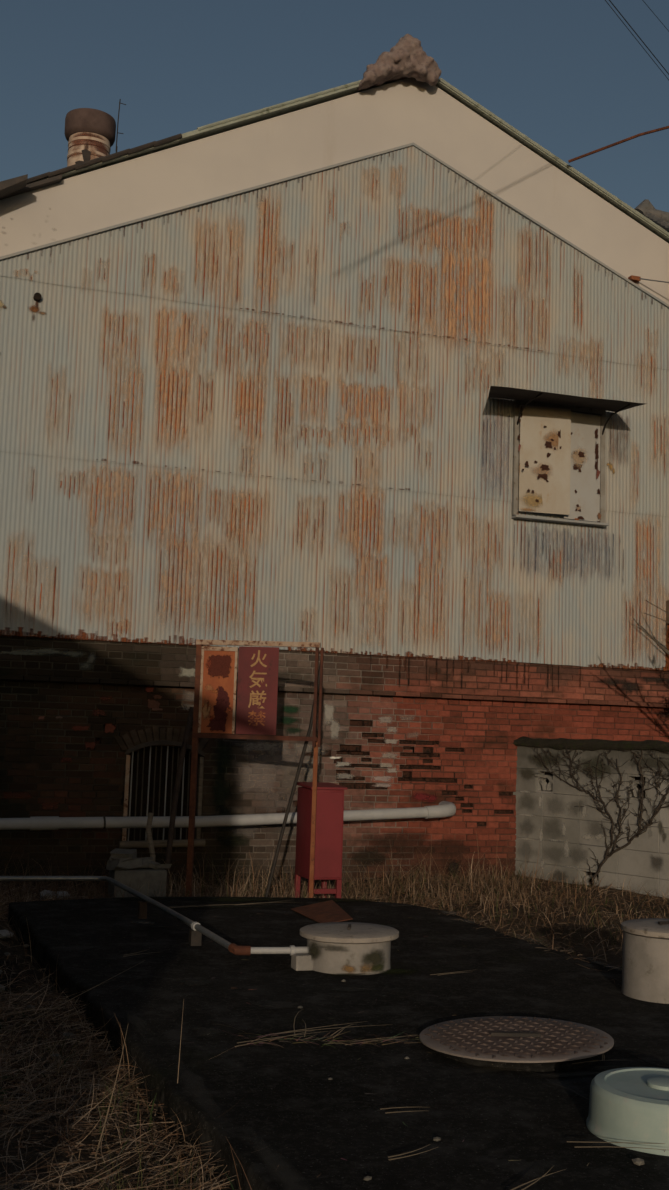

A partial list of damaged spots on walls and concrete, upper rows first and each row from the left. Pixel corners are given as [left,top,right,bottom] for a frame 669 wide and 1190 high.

rust [0,196,548,663]
rust [588,520,669,671]
spalling [254,720,513,826]